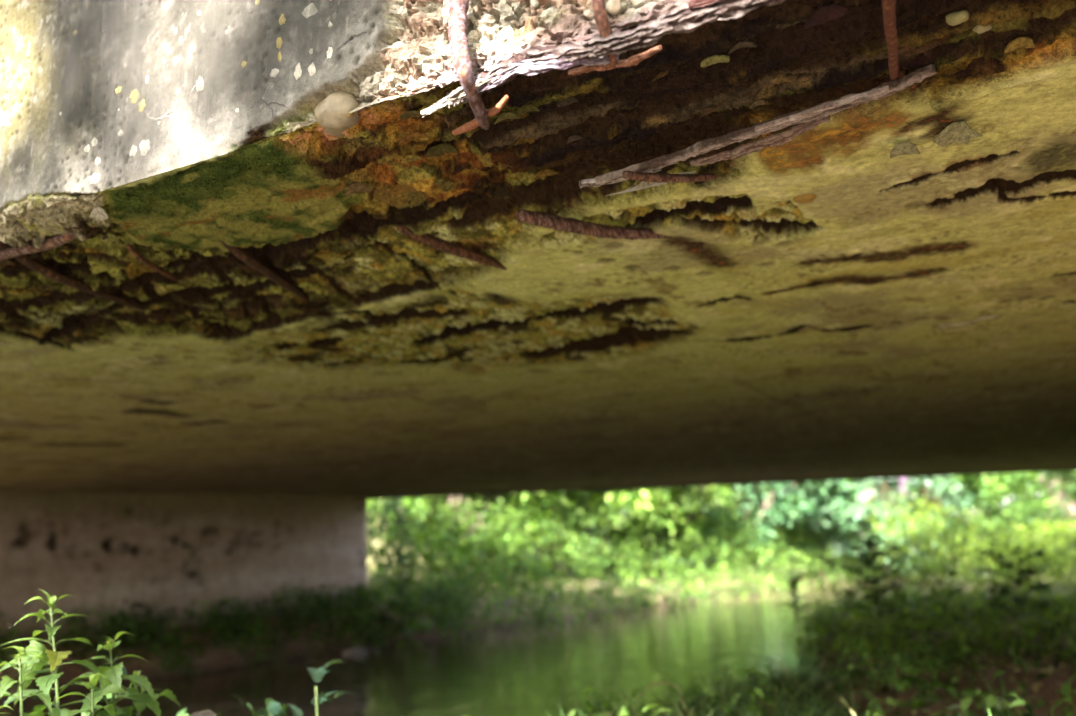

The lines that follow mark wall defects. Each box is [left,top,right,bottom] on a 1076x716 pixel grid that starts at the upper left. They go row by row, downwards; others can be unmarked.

corrosion [879,68,932,95]
corrosion [753,106,965,173]
spalling [0,0,1076,350]
crack [878,150,1076,211]
corrosion [667,238,737,267]